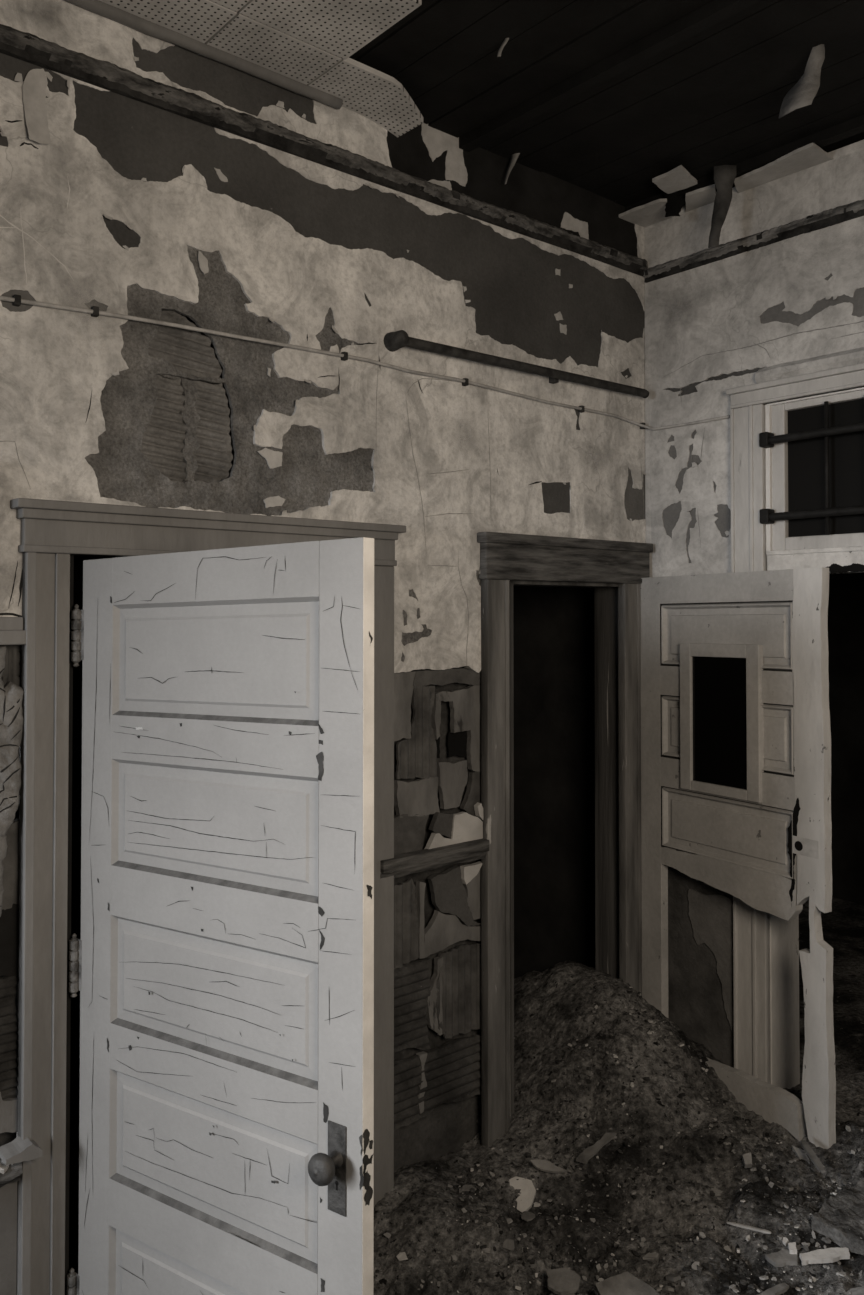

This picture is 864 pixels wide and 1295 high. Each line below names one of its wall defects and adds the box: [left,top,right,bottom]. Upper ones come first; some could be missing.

peeling [132,38,316,124]
peeling [0,53,645,367]
peeling [760,273,864,326]
flaking render [85,247,377,516]
peeling [542,482,571,514]
peeling [624,468,646,521]
peeling [663,430,702,563]
peeling [713,481,731,538]
flaking render [1,645,22,687]
flaking render [394,589,483,855]
flaking render [0,817,20,1133]
flaking render [394,861,482,1131]